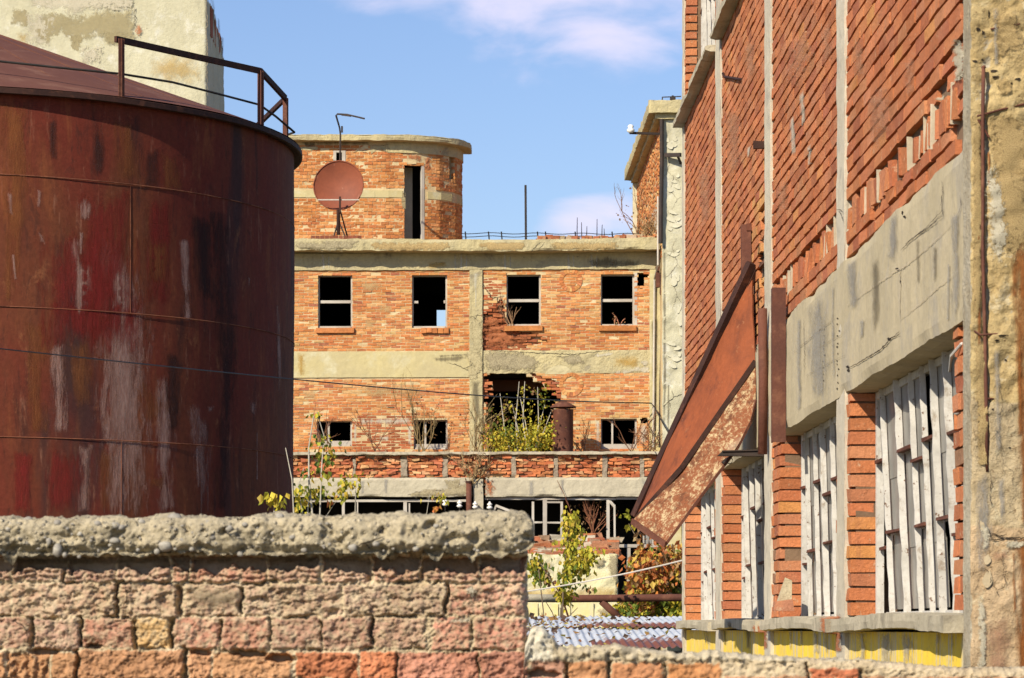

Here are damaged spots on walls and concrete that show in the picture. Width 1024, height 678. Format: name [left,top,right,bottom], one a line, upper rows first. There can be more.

peeling [11,0,142,64]
spalling [976,11,1024,56]
spalling [772,39,1020,296]
crack [901,187,961,250]
spalling [971,114,1024,316]